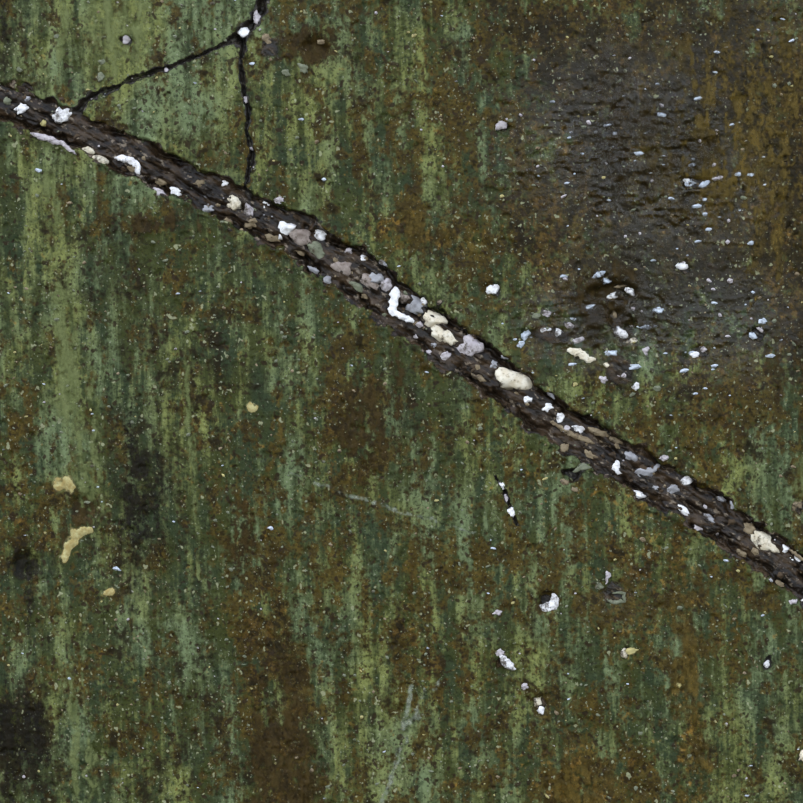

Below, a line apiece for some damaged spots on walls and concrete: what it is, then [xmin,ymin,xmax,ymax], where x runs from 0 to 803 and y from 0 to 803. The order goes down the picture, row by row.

corrosion [290,6,342,66]
leakage [555,36,722,214]
corrosion [651,23,803,281]
crack [0,0,803,609]
corrosion [560,259,643,326]
leakage [569,275,674,408]
corrosion [336,335,407,494]
corrosion [59,496,96,549]
corrosion [226,504,256,573]